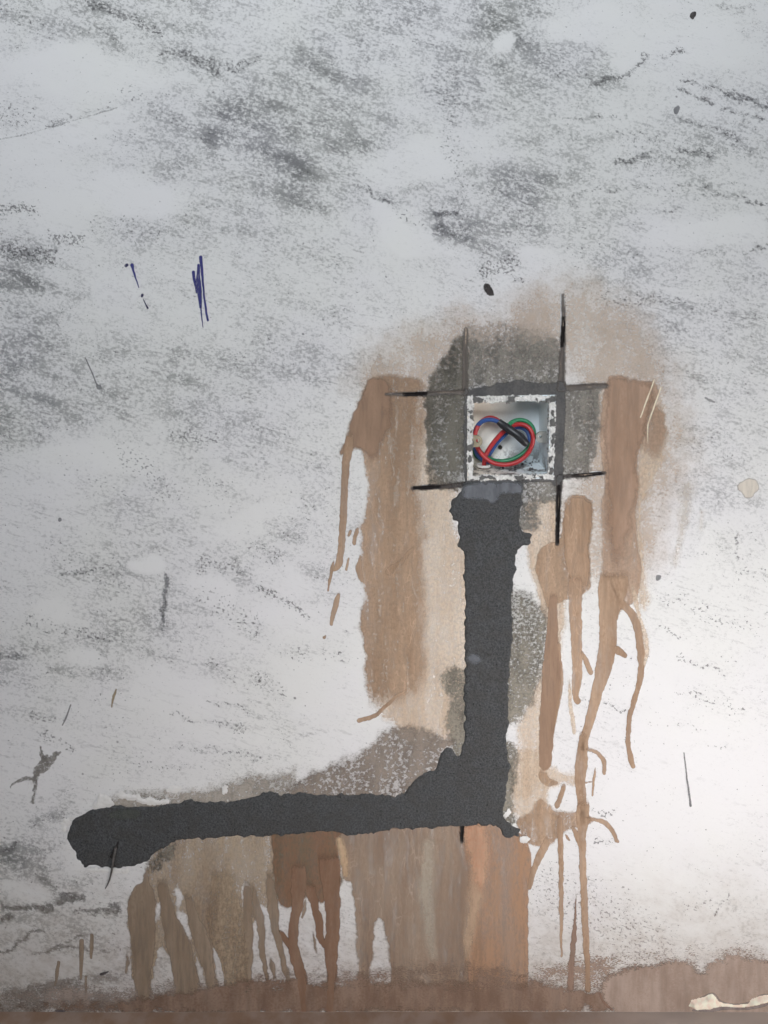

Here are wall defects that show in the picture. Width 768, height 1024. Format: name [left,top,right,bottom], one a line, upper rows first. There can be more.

water stain [125,835,278,1012]
water stain [323,293,680,993]